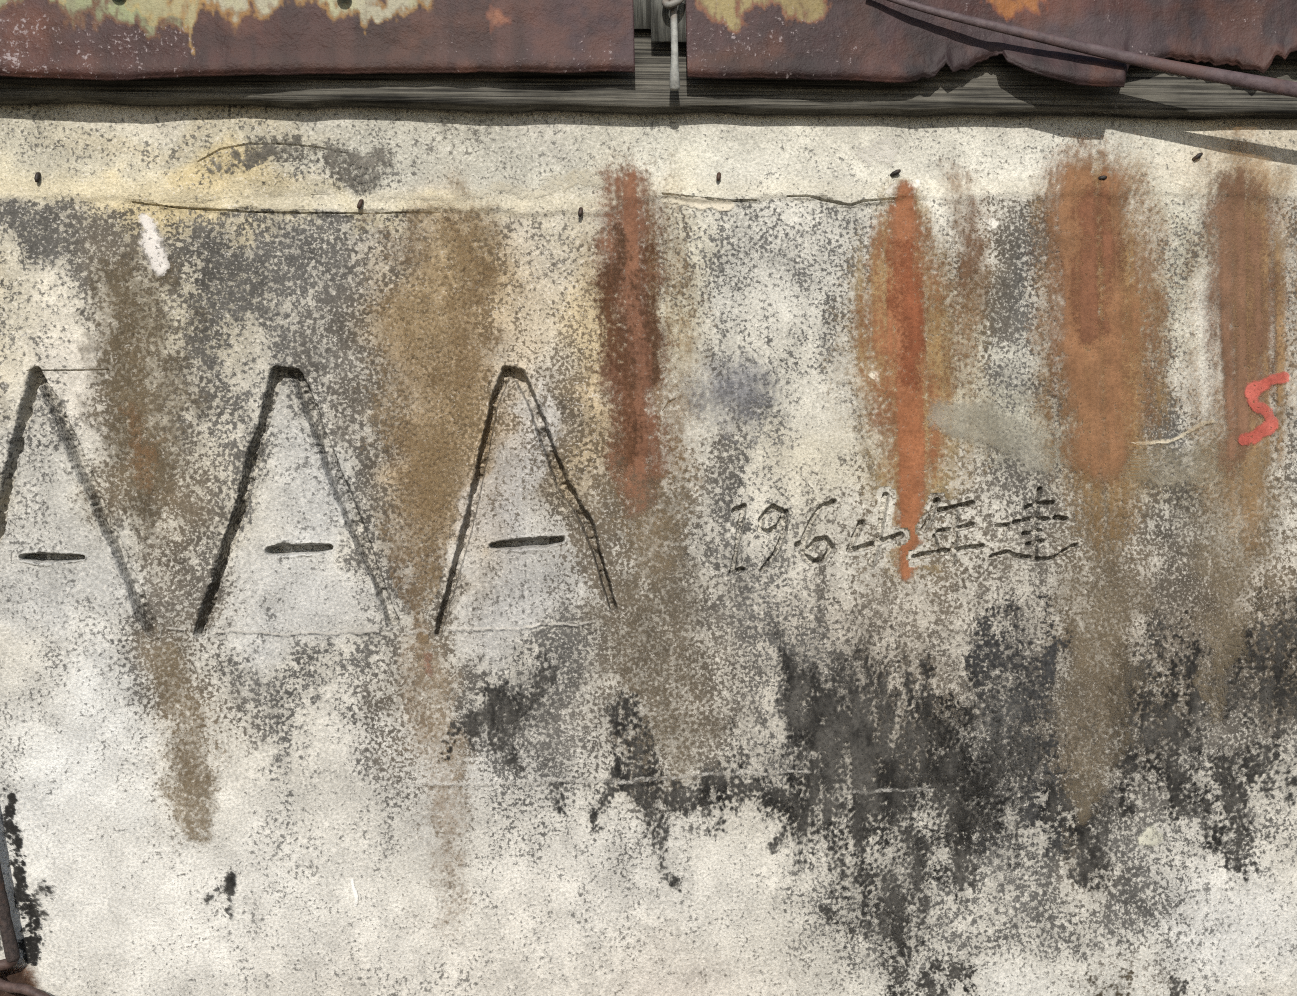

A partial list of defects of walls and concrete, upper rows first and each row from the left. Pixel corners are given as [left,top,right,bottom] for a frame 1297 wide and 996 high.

corrosion [597,168,683,516]
corrosion [854,177,987,580]
corrosion [1042,152,1167,534]
corrosion [1207,130,1289,543]
corrosion [0,965,37,996]
mould [546,774,567,815]
mould [585,586,1297,996]